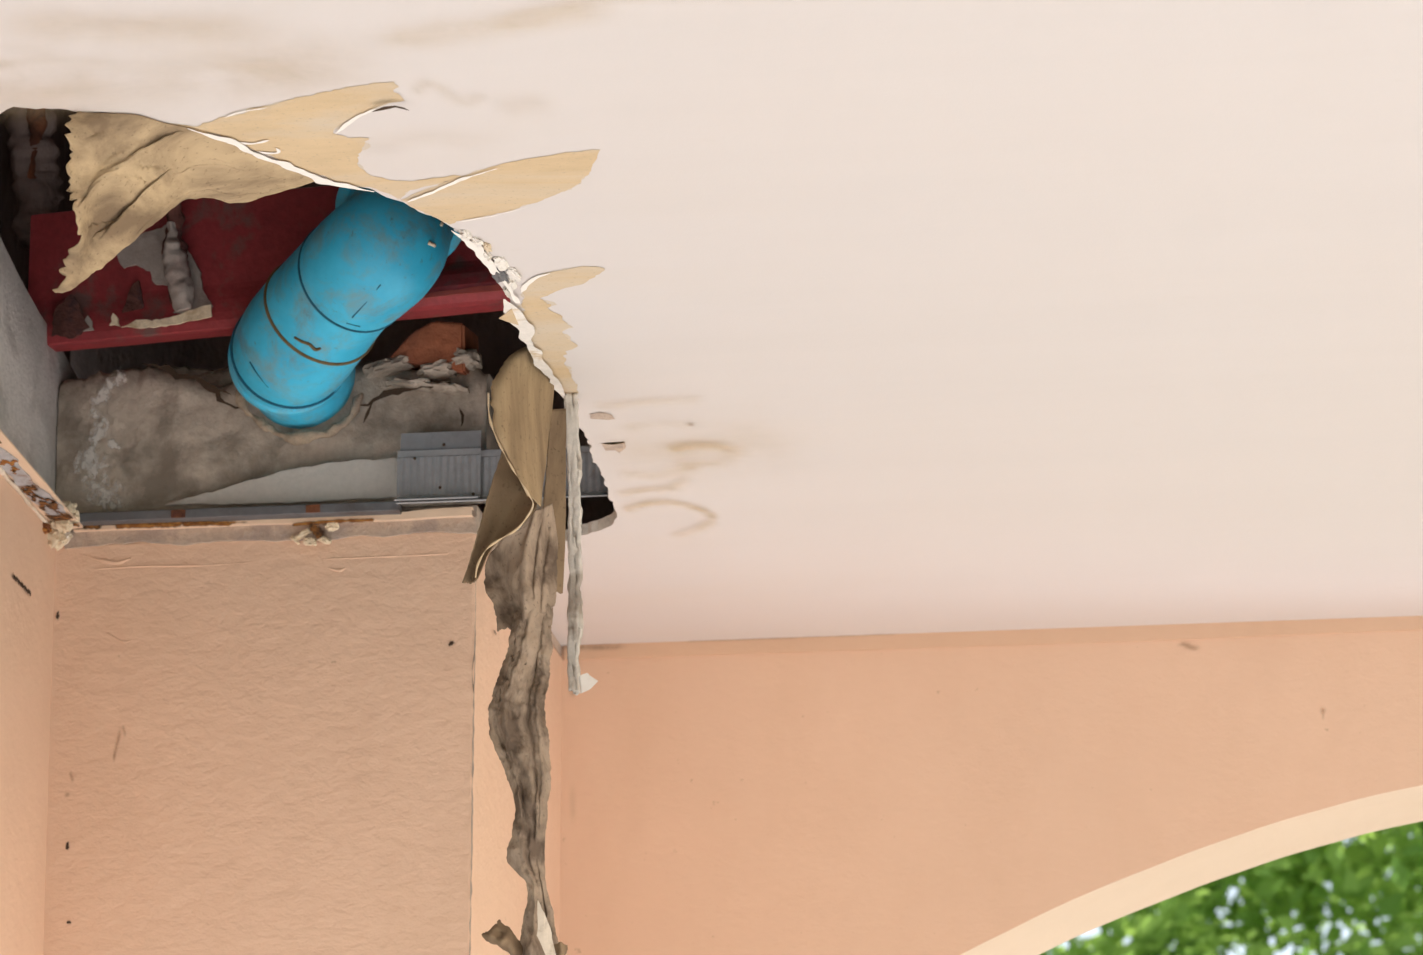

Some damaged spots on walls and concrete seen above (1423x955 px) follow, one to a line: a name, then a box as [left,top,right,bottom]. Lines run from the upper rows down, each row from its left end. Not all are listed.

peeling [169,82,605,400]
peeling [117,225,168,286]
peeling [83,313,120,332]
peeling [589,412,615,420]
peeling [602,442,626,453]
peeling [0,447,66,516]
peeling [578,673,598,693]